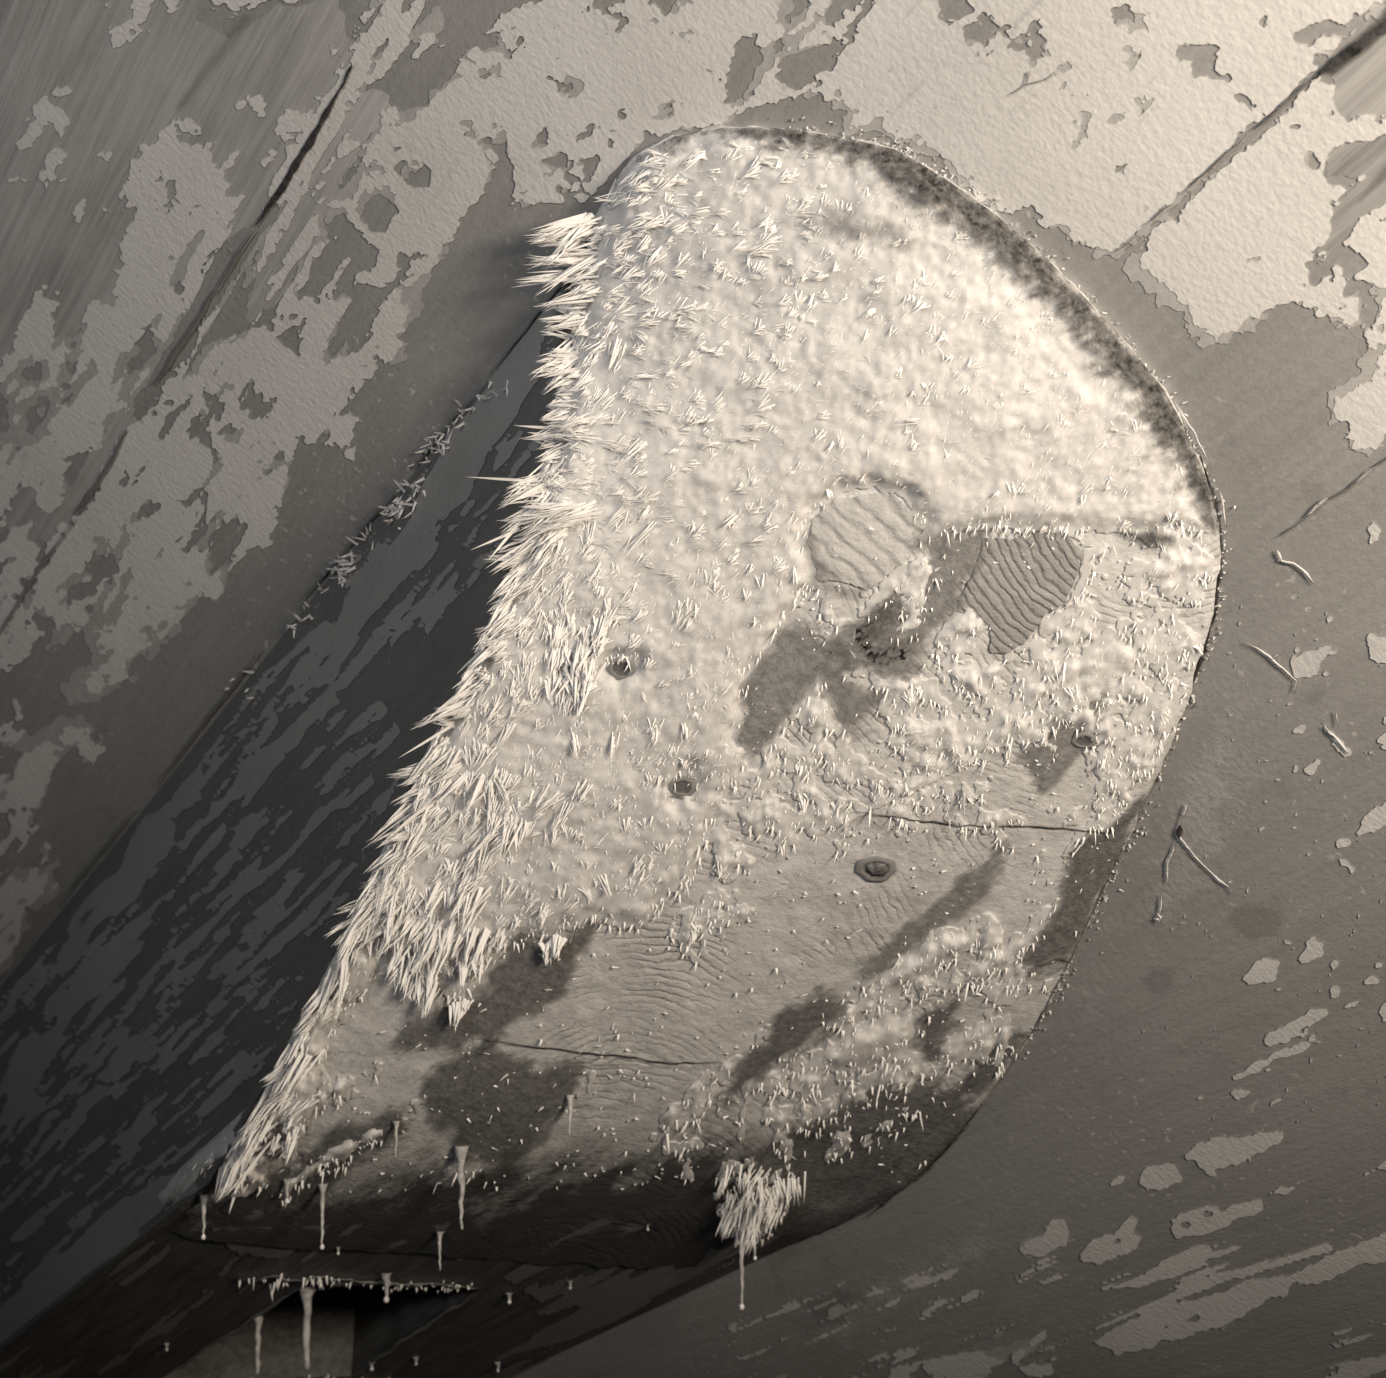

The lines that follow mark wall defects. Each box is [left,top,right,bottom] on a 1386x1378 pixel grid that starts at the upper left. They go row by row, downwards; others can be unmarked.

crack [1276,458,1386,584]
peeling [0,292,564,1378]
leakage [1104,707,1275,933]
peeling [1231,936,1359,1100]
peeling [1364,963,1383,985]
peeling [1110,1087,1298,1191]
peeling [478,1230,783,1378]
peeling [727,1264,984,1378]
peeling [852,1324,1069,1378]
peeling [1016,1216,1141,1284]
peeling [1089,1187,1386,1356]
peeling [1325,1322,1386,1378]